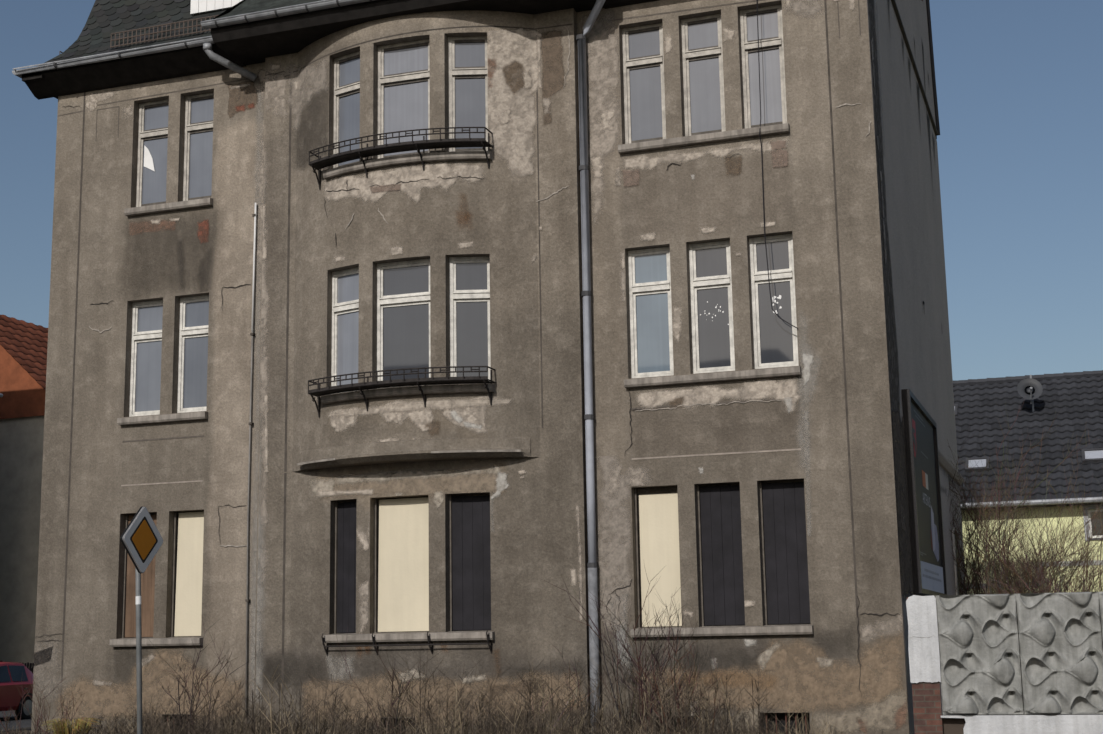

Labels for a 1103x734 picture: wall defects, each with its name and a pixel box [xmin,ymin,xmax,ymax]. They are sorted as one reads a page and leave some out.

flaking render [487,28,564,177]
flaking render [324,163,484,202]
water stain [868,0,901,573]
flaking render [636,379,799,412]
flaking render [329,396,511,440]